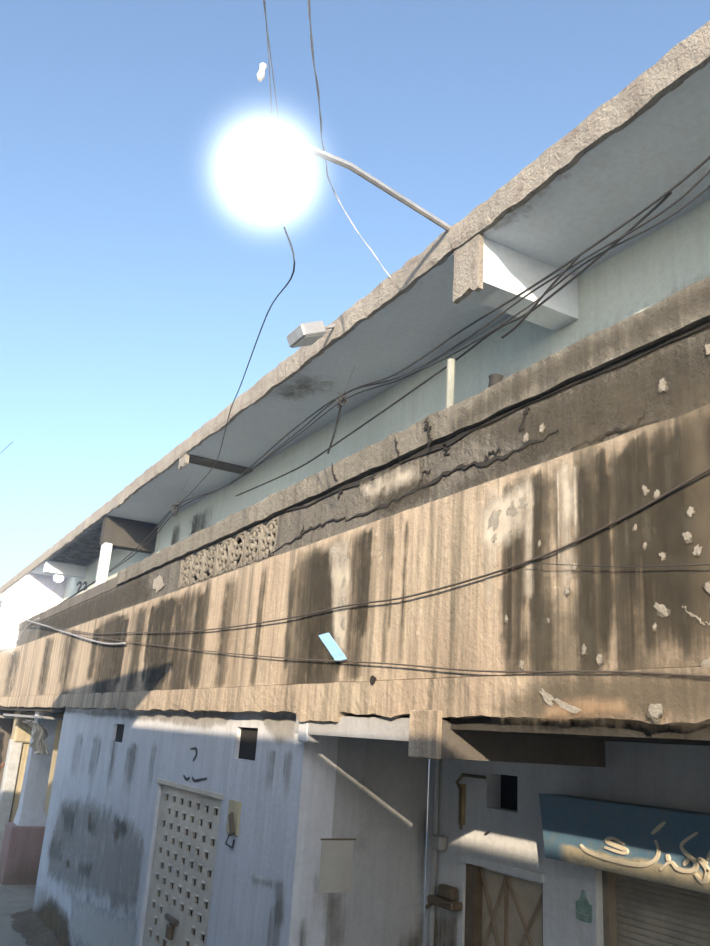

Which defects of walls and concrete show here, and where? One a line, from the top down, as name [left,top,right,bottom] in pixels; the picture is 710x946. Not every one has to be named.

crack [268,322,710,556]
water stain [492,334,710,458]
spalling [641,485,660,499]
water stain [48,520,116,566]
water stain [38,578,210,695]
water stain [217,607,232,686]
water stain [251,584,265,682]
water stain [284,531,372,684]
water stain [484,416,710,717]
spalling [652,602,671,632]
spalling [682,532,702,557]
crack [682,605,710,626]